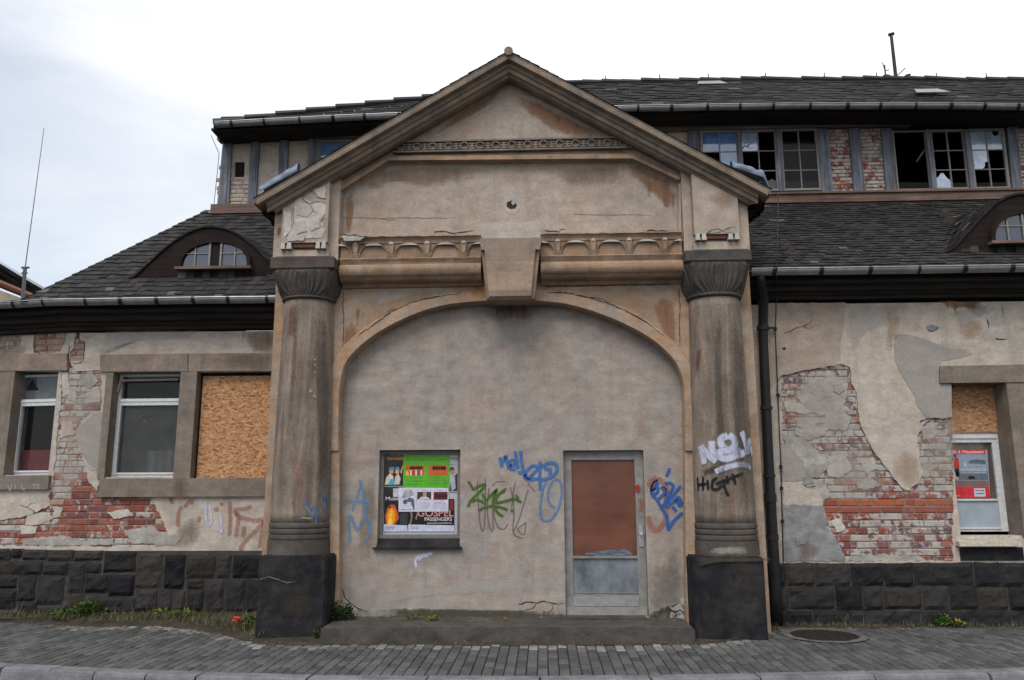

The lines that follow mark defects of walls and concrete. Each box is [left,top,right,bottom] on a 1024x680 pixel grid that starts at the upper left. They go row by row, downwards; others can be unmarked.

flaking render [283,186,326,242]
crack [545,284,681,342]
flaking render [0,331,180,548]
flaking render [780,364,953,562]
crack [519,600,563,612]